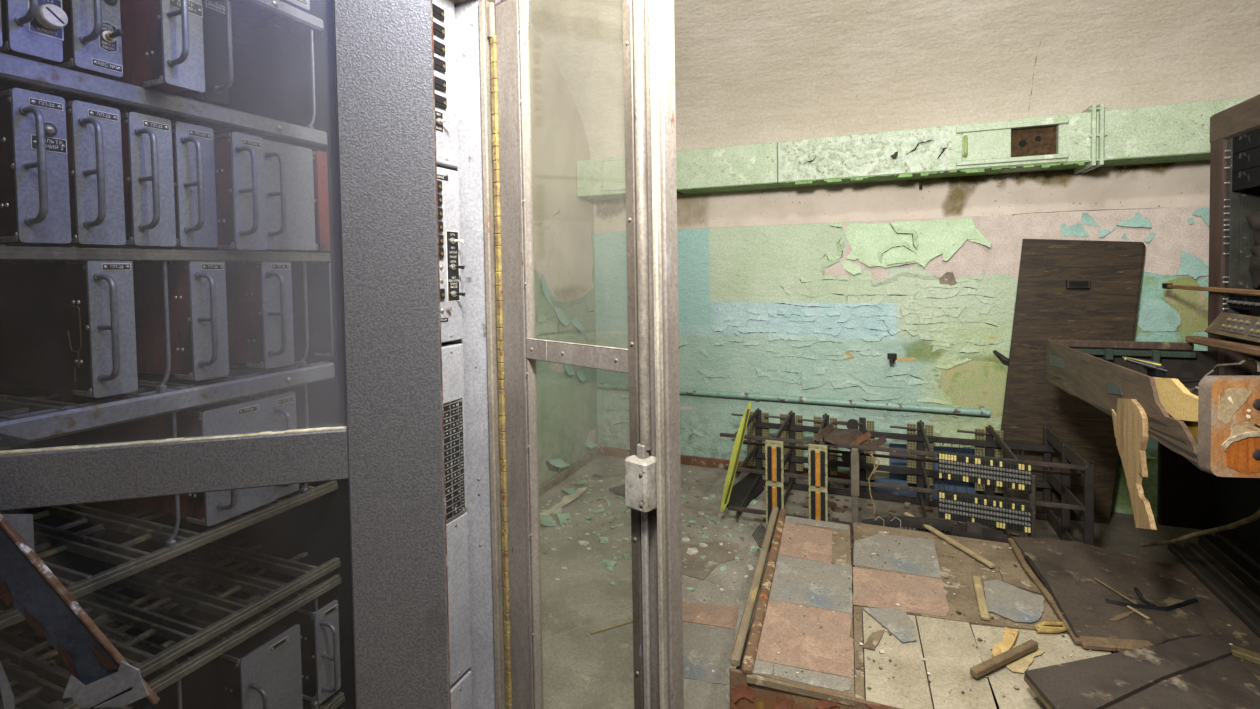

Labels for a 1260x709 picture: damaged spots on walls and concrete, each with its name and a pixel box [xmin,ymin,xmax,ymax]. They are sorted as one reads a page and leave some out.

peeling [533,220,595,344]
peeling [697,206,1210,439]